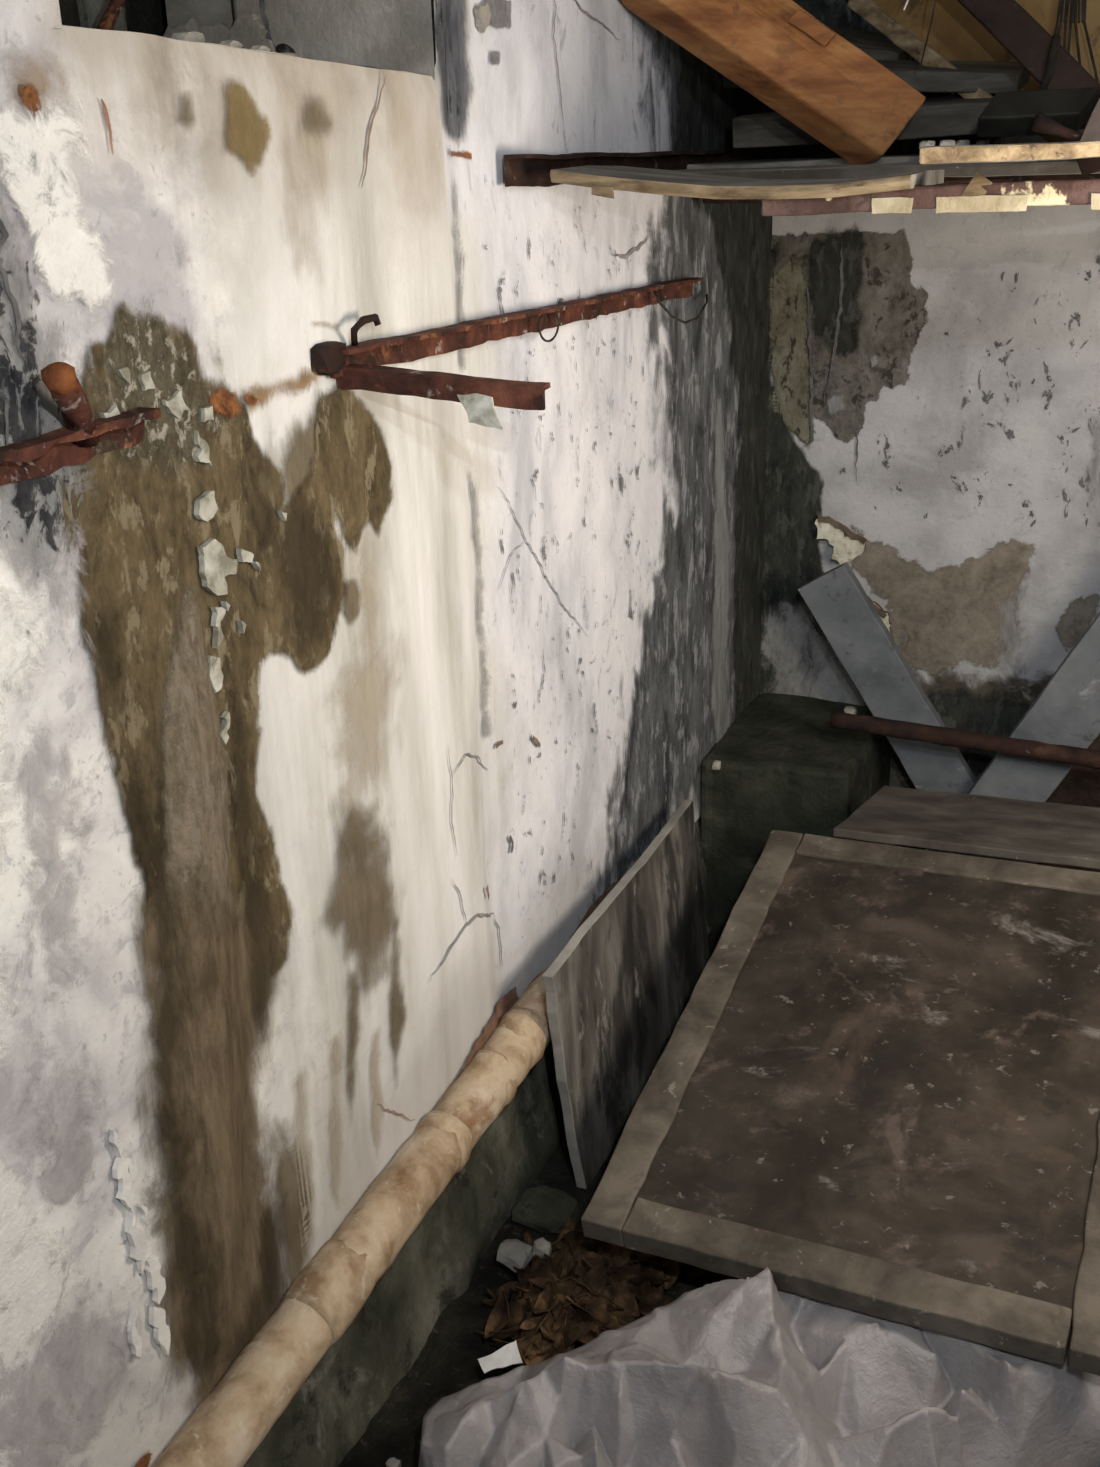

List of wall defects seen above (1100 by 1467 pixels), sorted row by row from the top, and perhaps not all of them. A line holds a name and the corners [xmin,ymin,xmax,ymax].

crack [553,0,621,141]
leakage [632,20,839,159]
leakage [0,183,67,447]
rust [0,362,161,485]
peeling [115,367,214,466]
spalling [768,228,928,493]
peeling [938,337,1055,457]
peeling [194,490,261,692]
leakage [591,195,867,902]
peeling [814,514,867,565]
leakage [0,304,393,1408]
leakage [329,800,406,1198]